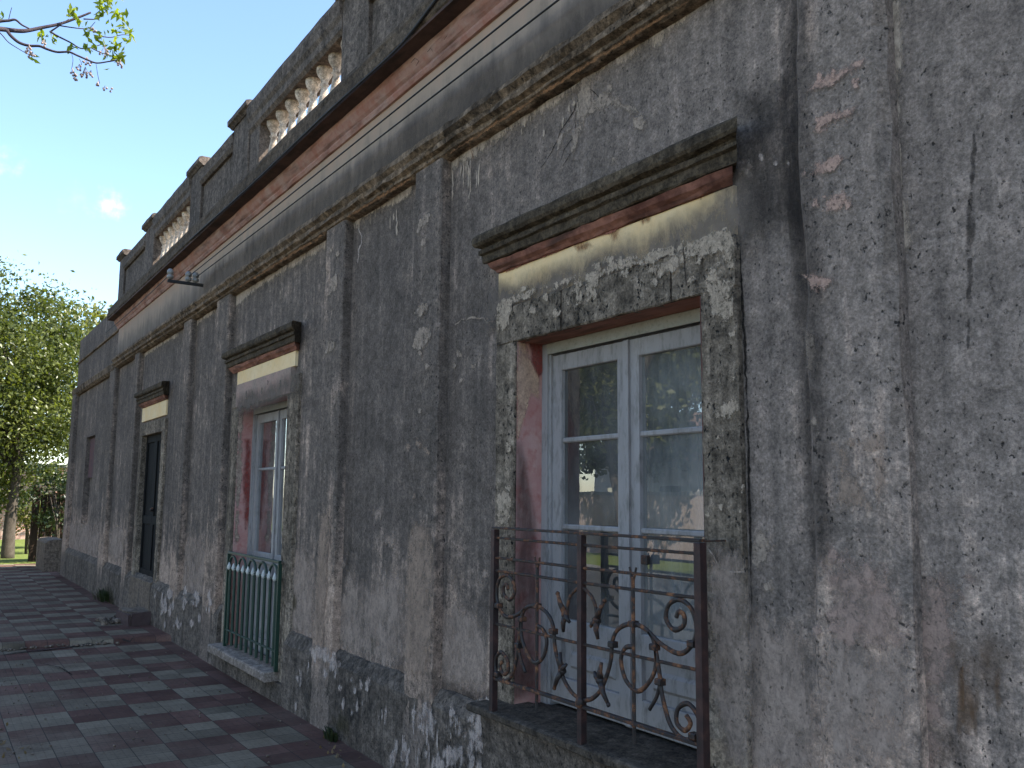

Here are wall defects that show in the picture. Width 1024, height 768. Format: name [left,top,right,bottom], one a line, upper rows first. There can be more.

peeling [810,58,864,90]
crack [542,88,611,166]
peeling [815,107,855,133]
peeling [804,155,842,175]
peeling [812,190,851,211]
peeling [455,227,736,337]
peeling [804,275,831,291]
crack [707,234,754,742]